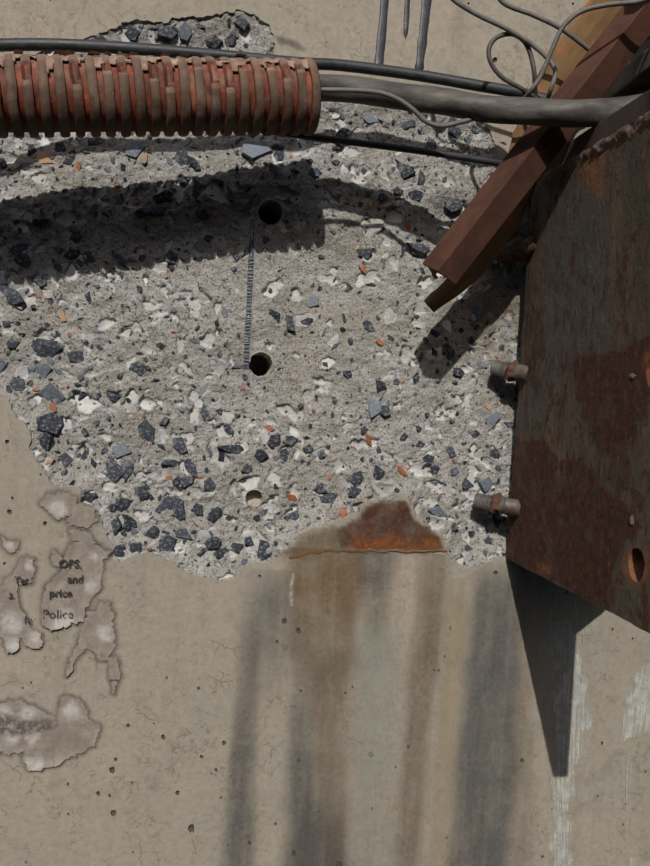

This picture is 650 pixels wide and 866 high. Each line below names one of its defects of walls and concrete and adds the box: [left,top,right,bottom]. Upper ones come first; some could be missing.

spalling [42,10,274,59]
spalling [0,102,531,582]
rust [293,501,442,553]
water stain [451,586,517,866]